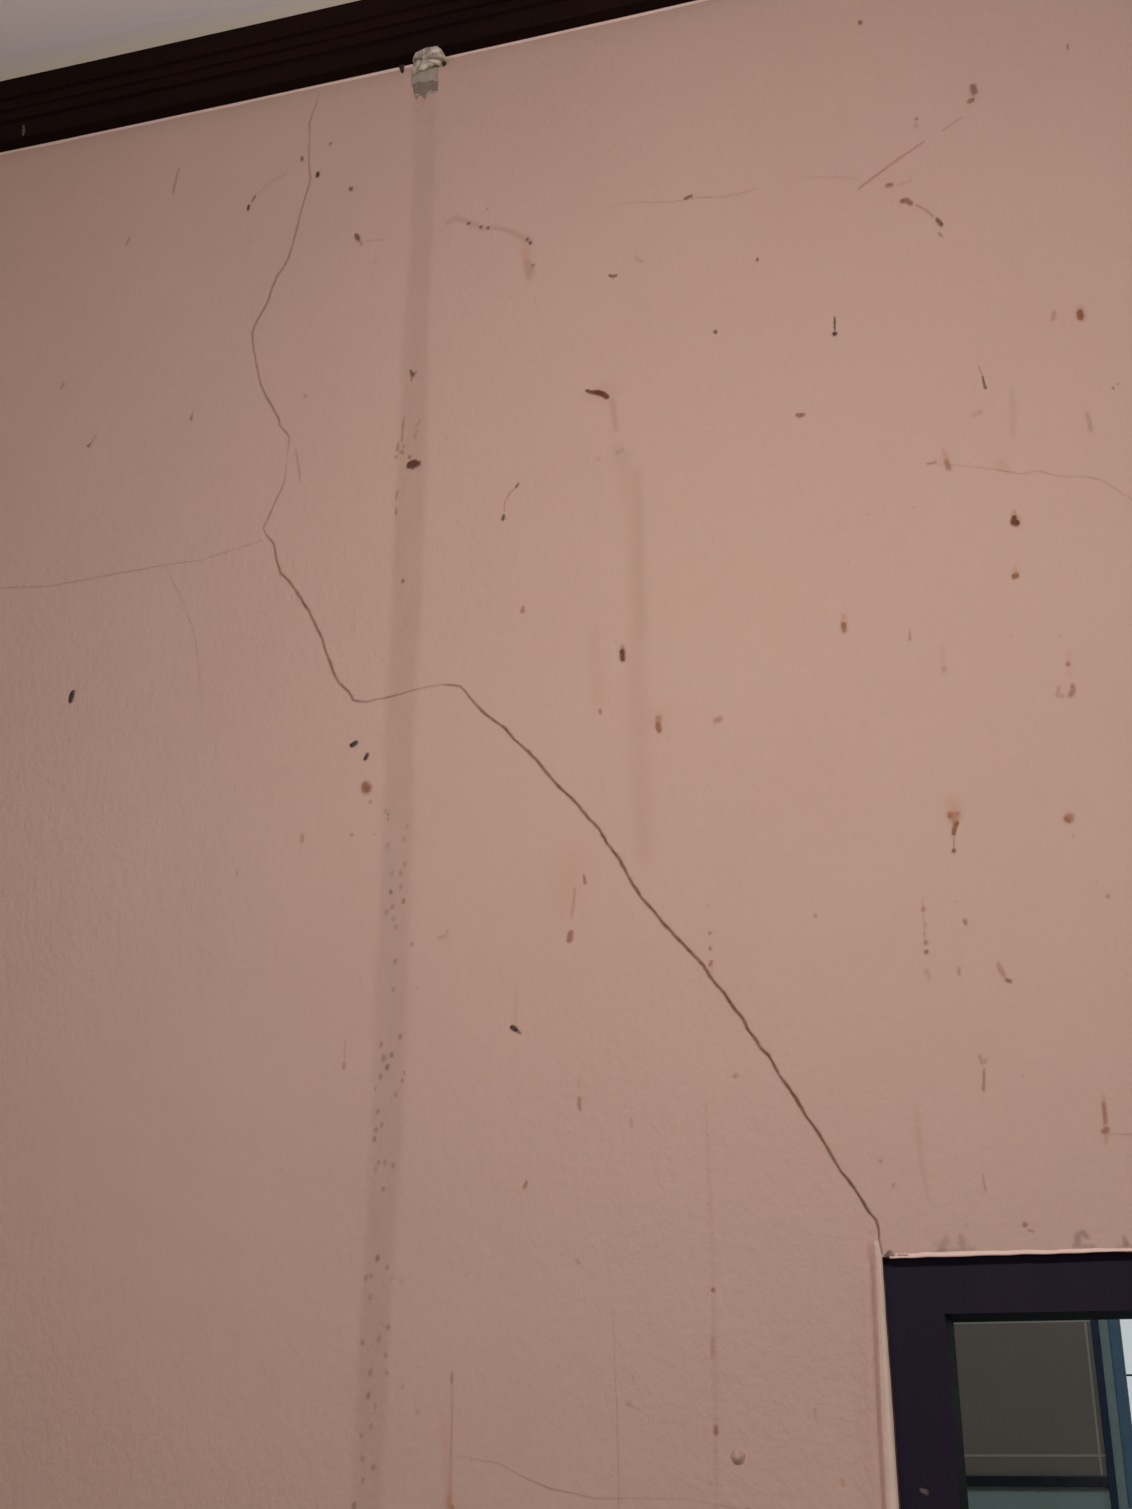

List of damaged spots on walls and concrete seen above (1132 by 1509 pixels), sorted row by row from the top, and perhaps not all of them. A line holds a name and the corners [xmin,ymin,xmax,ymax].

crack [482,711,879,1230]